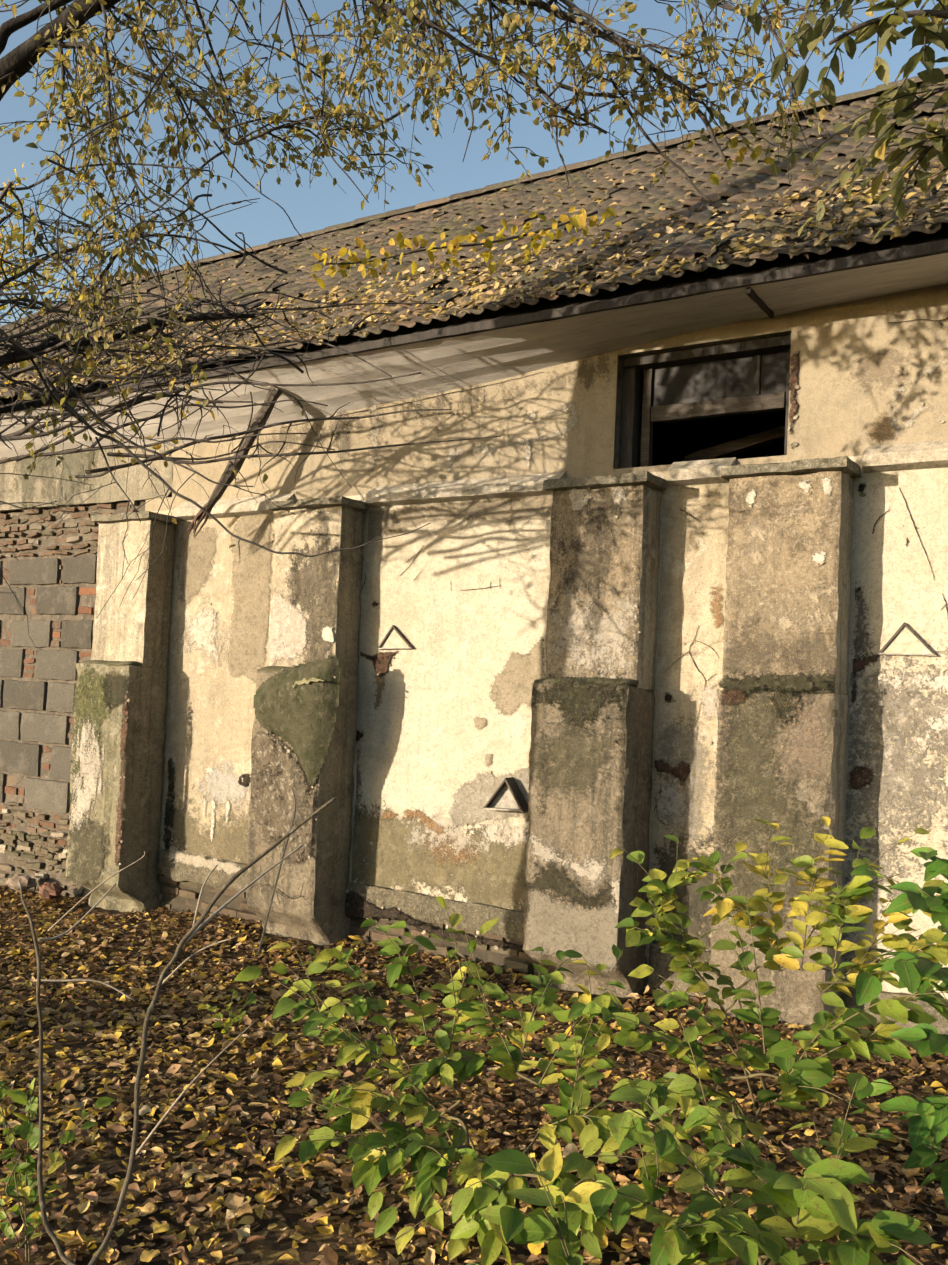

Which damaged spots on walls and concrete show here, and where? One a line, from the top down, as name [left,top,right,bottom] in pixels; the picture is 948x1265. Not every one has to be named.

damp [286,506,338,664]
corrosion [360,651,398,708]
peeling [474,638,545,730]
crack [668,625,719,721]
peeling [449,753,529,827]
corrosion [655,759,690,809]